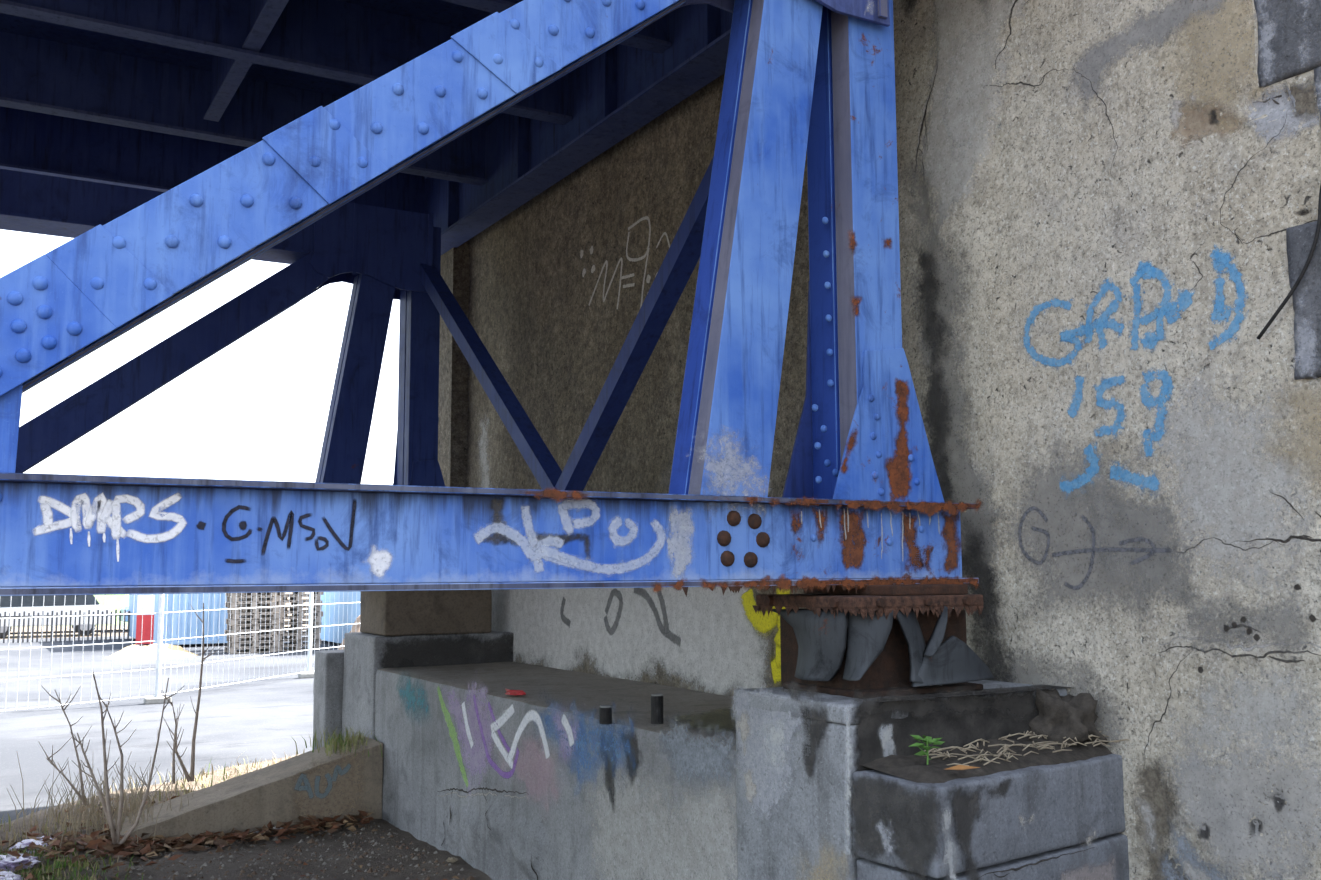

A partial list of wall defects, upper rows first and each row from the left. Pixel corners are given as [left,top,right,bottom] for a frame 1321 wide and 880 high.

crack [985,67,1118,178]
rust [526,489,586,502]
rust [653,380,984,621]
crack [1158,492,1321,553]
crack [1142,624,1321,771]
crack [438,787,529,846]